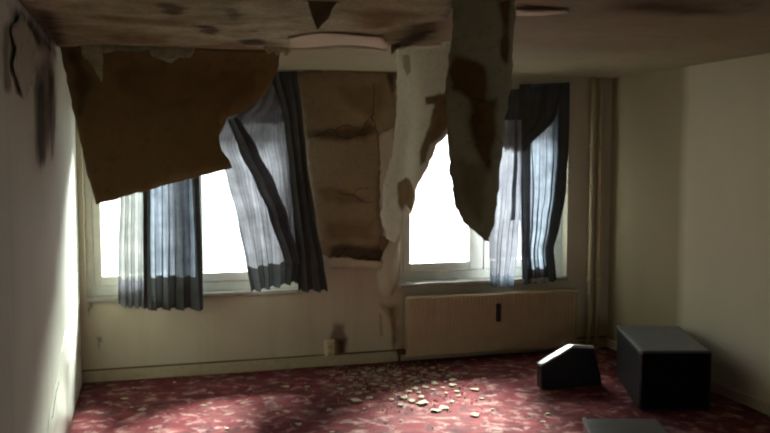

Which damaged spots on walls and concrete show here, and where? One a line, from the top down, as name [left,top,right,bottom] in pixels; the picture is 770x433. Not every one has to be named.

peeling [4,14,38,99]
peeling [307,1,341,30]
peeling [297,70,397,269]
peeling [444,0,568,241]